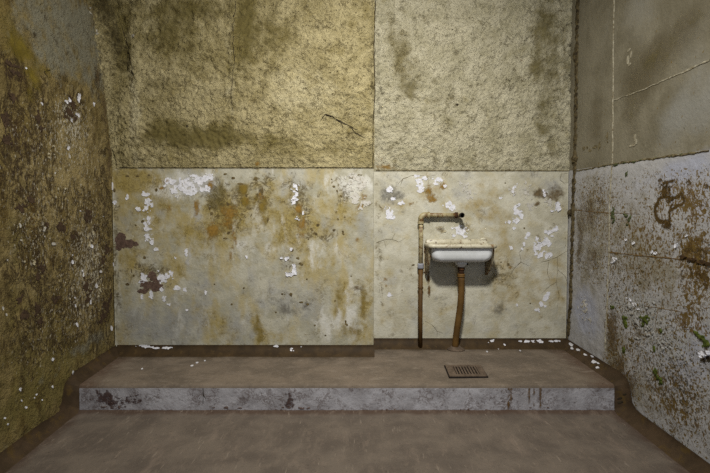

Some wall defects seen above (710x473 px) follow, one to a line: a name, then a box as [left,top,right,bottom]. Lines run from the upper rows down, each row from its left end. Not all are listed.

crack [321,114,365,138]
peeling [331,172,371,210]
peeling [384,186,405,219]
peeling [414,174,447,193]
peeling [435,221,471,238]
peeling [499,181,561,259]
corrosion [654,178,691,229]
peeling [43,173,214,331]
corrosion [609,234,709,318]
leakage [608,315,617,350]